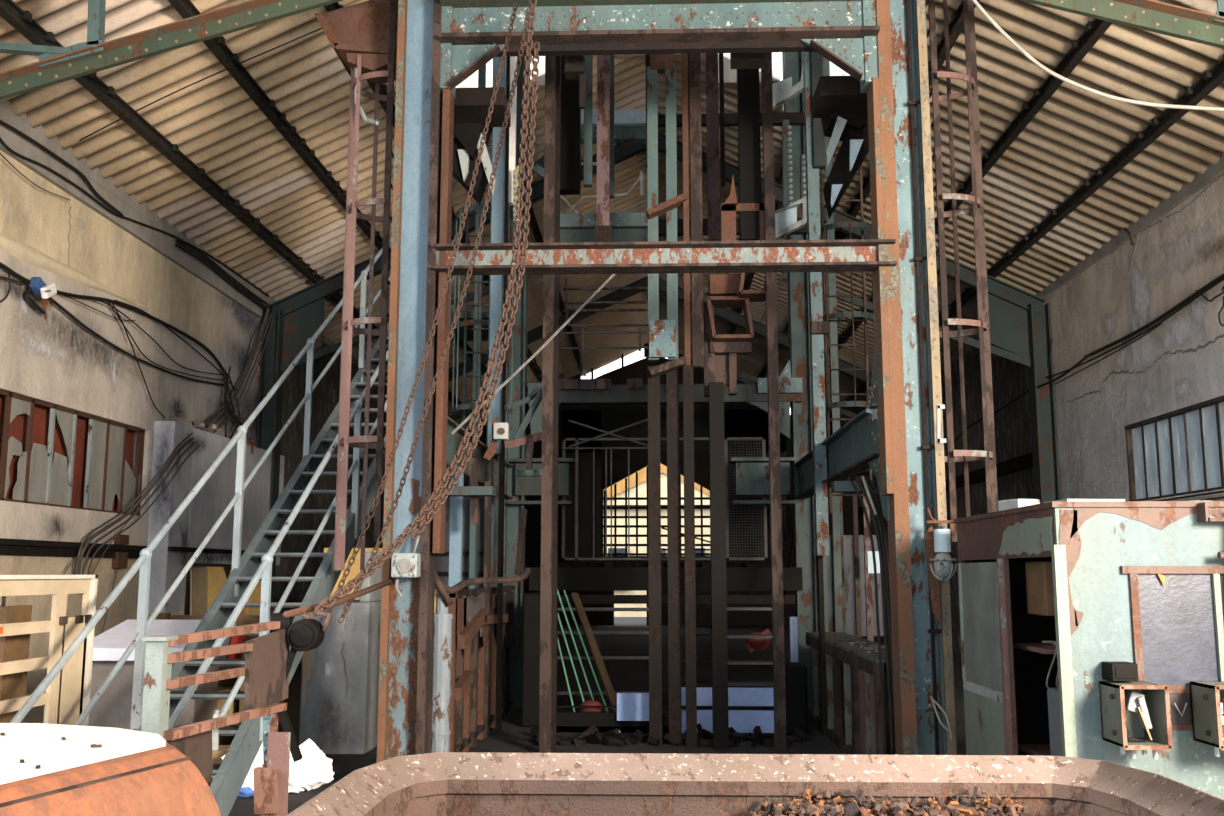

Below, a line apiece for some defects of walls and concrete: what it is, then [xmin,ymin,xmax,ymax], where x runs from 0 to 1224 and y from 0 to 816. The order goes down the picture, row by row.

crack [1067,334,1224,402]